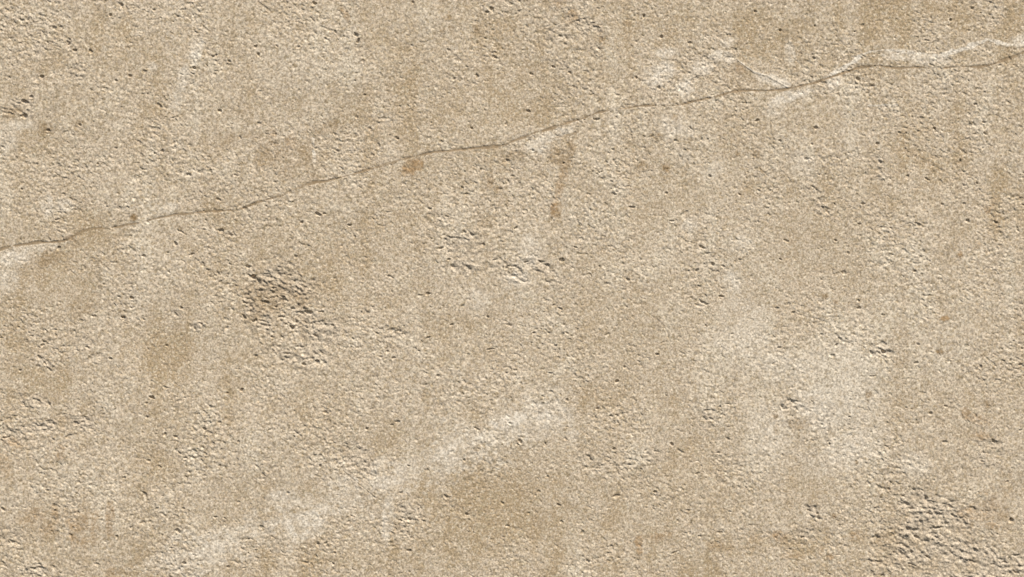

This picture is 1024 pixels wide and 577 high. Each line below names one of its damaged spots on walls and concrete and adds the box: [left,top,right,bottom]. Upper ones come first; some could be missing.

crack [0,51,1024,251]